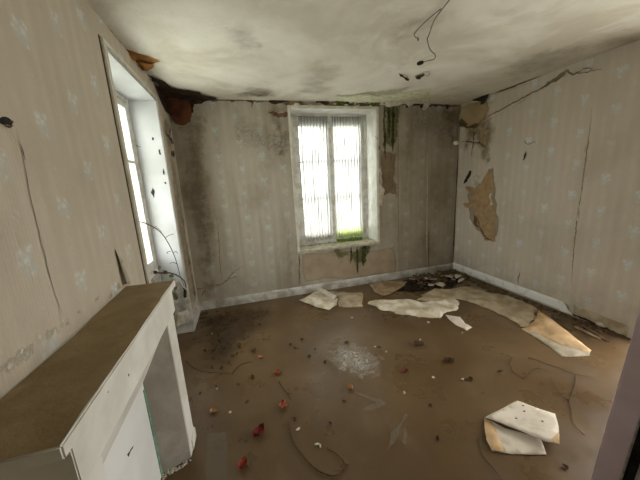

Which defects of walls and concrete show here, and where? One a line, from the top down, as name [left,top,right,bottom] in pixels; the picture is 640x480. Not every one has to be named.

spalling [126,49,160,72]
crack [474,67,601,130]
damp [462,114,491,161]
crack [18,137,63,314]
peeling [375,136,397,207]
peeling [463,168,498,242]
crack [571,114,592,282]
crack [115,250,131,285]
damp [302,248,396,281]